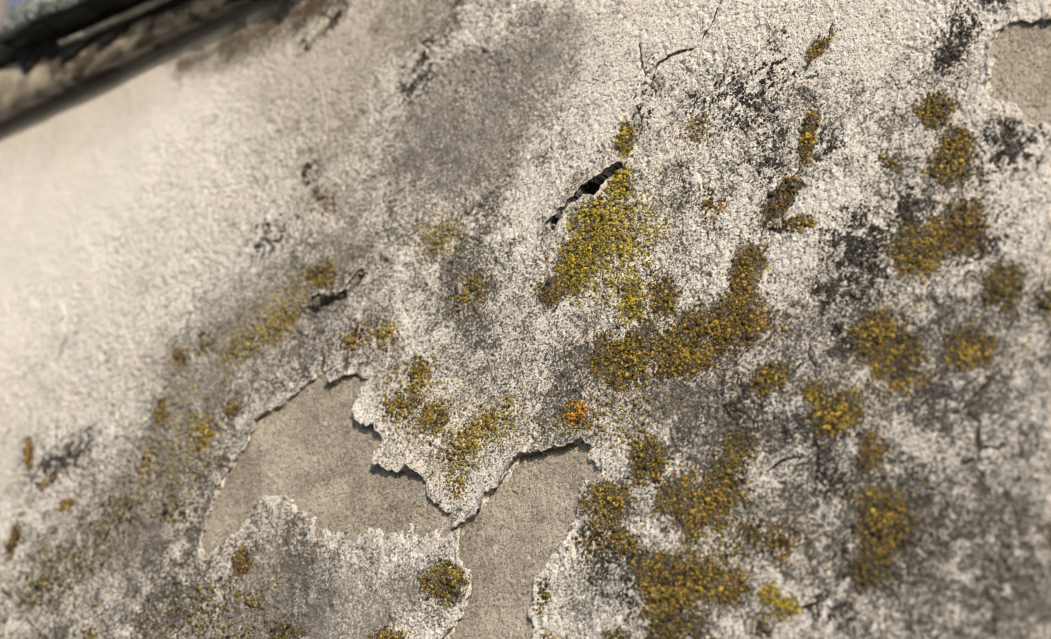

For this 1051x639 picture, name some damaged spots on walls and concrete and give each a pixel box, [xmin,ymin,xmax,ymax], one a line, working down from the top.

spalling [981,10,1051,127]
crack [539,154,623,237]
crack [297,265,366,372]
spalling [196,363,602,639]